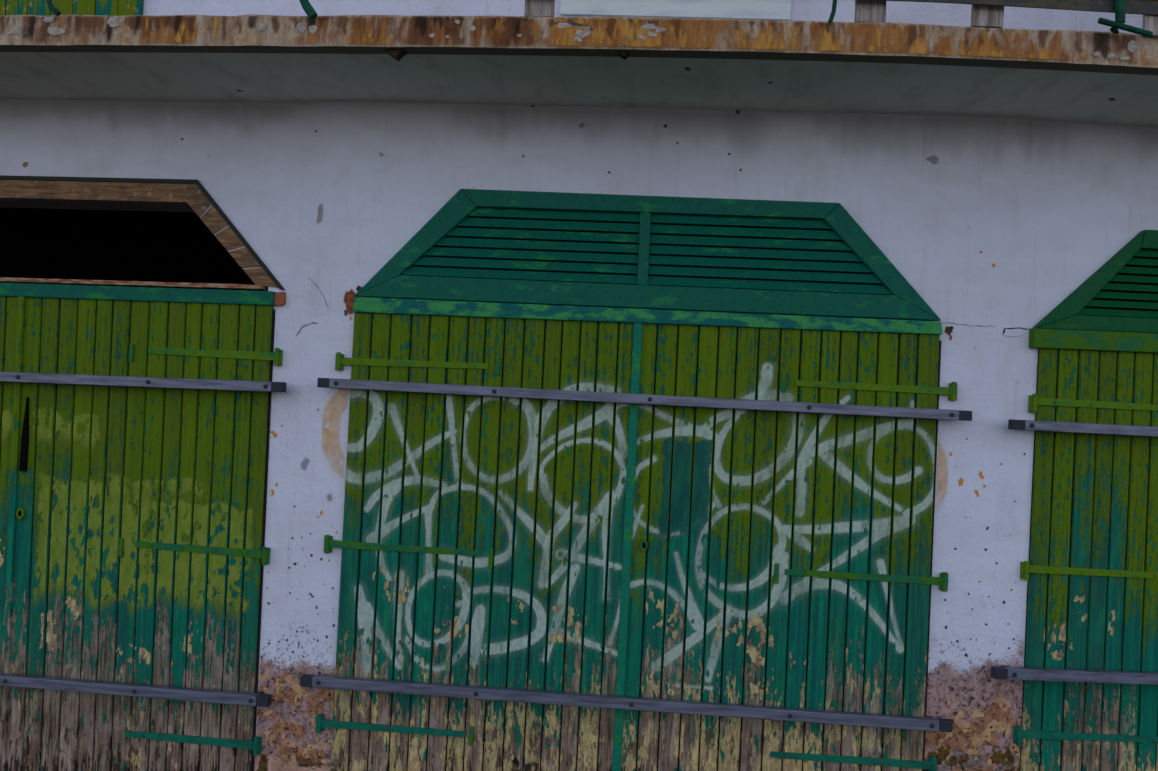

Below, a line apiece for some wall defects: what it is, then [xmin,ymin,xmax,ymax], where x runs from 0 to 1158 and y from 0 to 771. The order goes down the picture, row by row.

corrosion [23,16,112,42]
corrosion [125,16,197,43]
corrosion [213,16,256,39]
corrosion [293,16,1149,63]